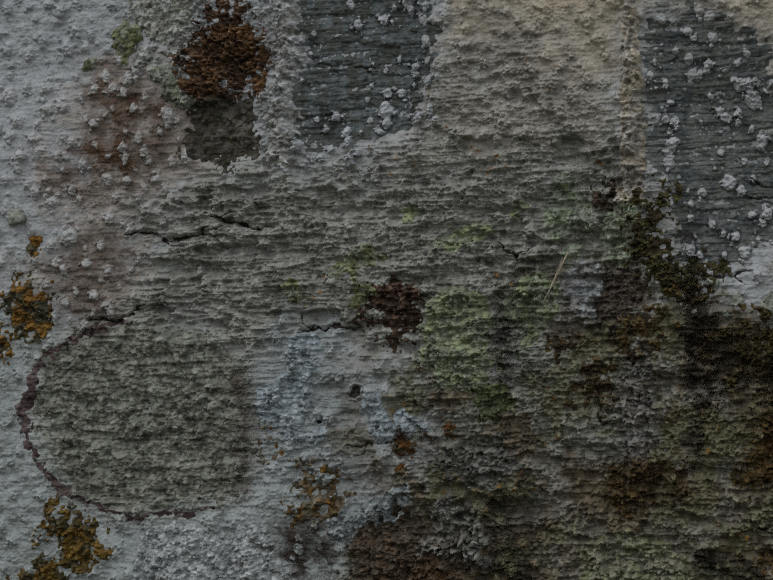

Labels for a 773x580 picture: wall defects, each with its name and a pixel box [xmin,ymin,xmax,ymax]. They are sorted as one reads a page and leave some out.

crack [124,210,268,248]